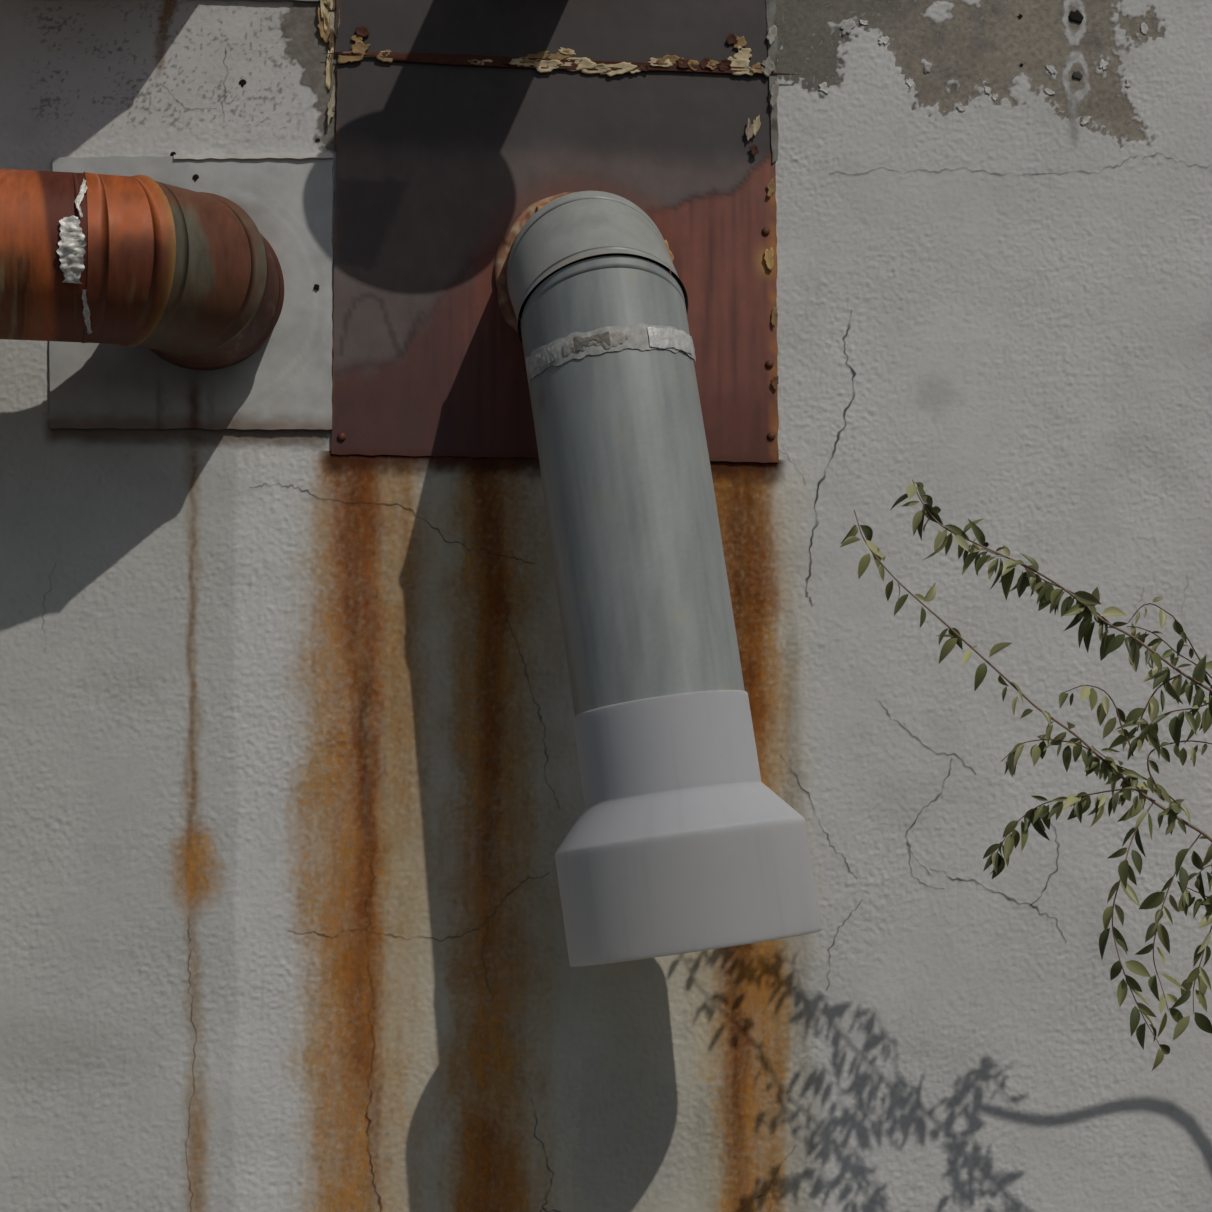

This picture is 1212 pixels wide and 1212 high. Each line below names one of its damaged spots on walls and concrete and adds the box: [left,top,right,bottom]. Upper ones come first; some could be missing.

peeling [281,0,1165,157]
crack [806,310,856,607]
rust [710,459,781,787]
rust [299,451,540,1212]
rust [721,941,786,1212]